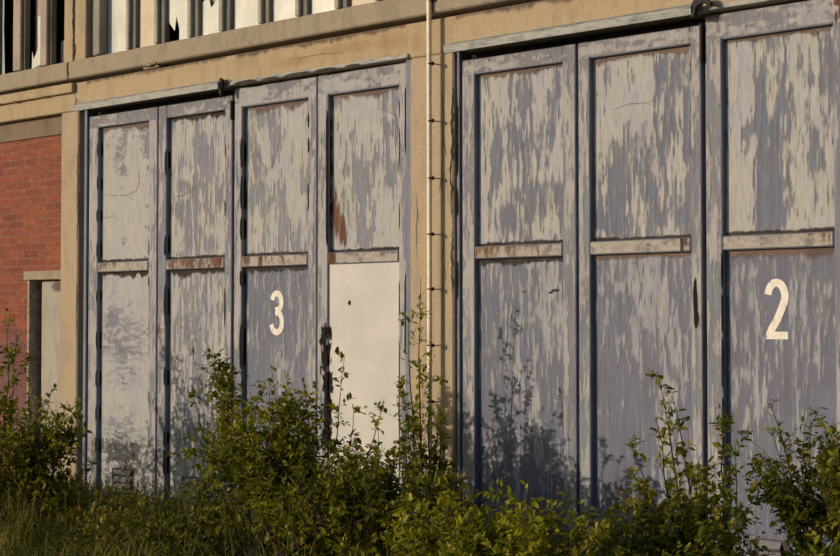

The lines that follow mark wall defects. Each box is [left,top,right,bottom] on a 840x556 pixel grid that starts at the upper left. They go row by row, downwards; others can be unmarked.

peeling [87,63,406,513]
corrosion [332,191,346,247]
crack [413,193,421,252]
crack [439,82,454,340]
peeling [462,0,840,553]